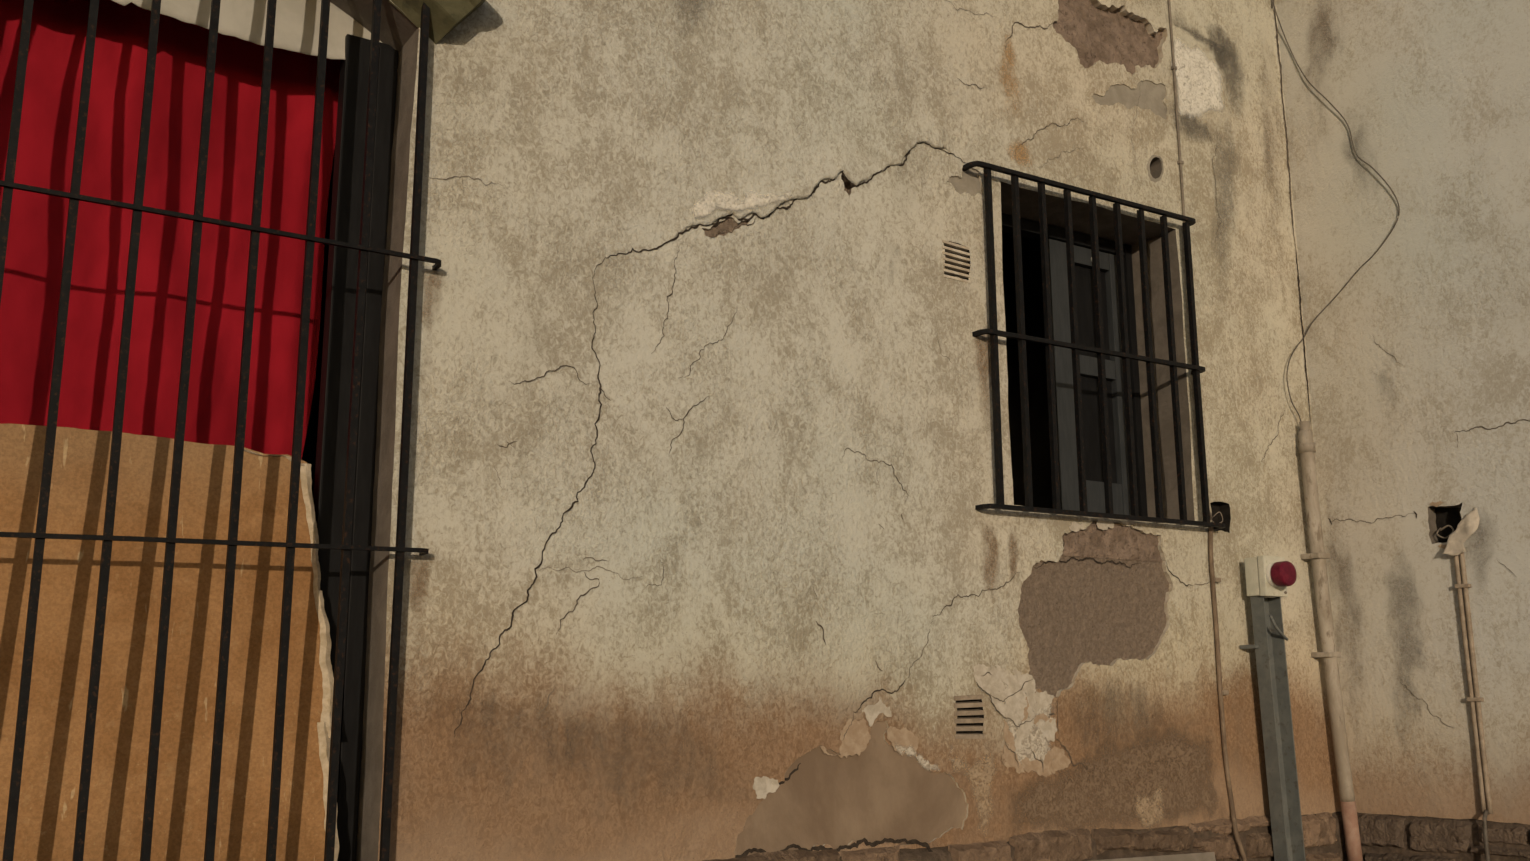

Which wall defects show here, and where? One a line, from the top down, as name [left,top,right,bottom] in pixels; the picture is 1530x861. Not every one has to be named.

spalling [1005,0,1223,120]
crack [454,142,965,738]
crack [1328,511,1417,525]
crack [1452,419,1530,447]
crack [842,572,1020,741]
spalling [734,518,1173,858]